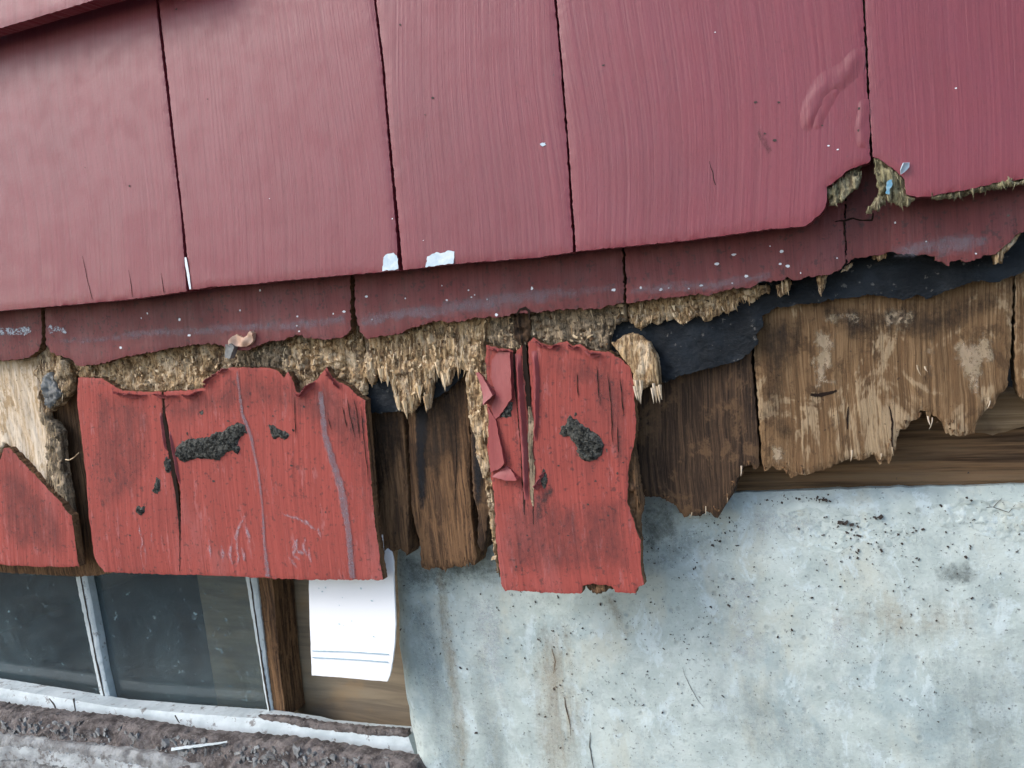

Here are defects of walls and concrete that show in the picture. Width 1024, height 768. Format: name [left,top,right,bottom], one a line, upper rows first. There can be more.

peeling [885,311,912,324]
peeling [40,372,63,409]
peeling [113,331,256,399]
crack [513,345,535,524]
peeling [476,340,602,500]
peeling [812,332,836,387]
peeling [955,339,993,393]
crack [160,404,181,571]